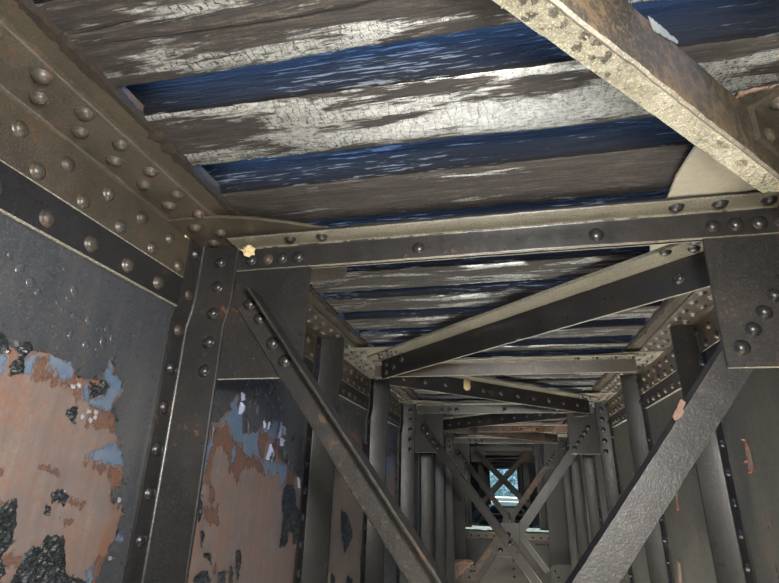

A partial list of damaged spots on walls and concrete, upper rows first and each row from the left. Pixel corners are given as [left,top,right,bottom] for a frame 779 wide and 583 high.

peeling [0,331,129,583]
peeling [188,391,301,583]
peeling [741,439,756,474]